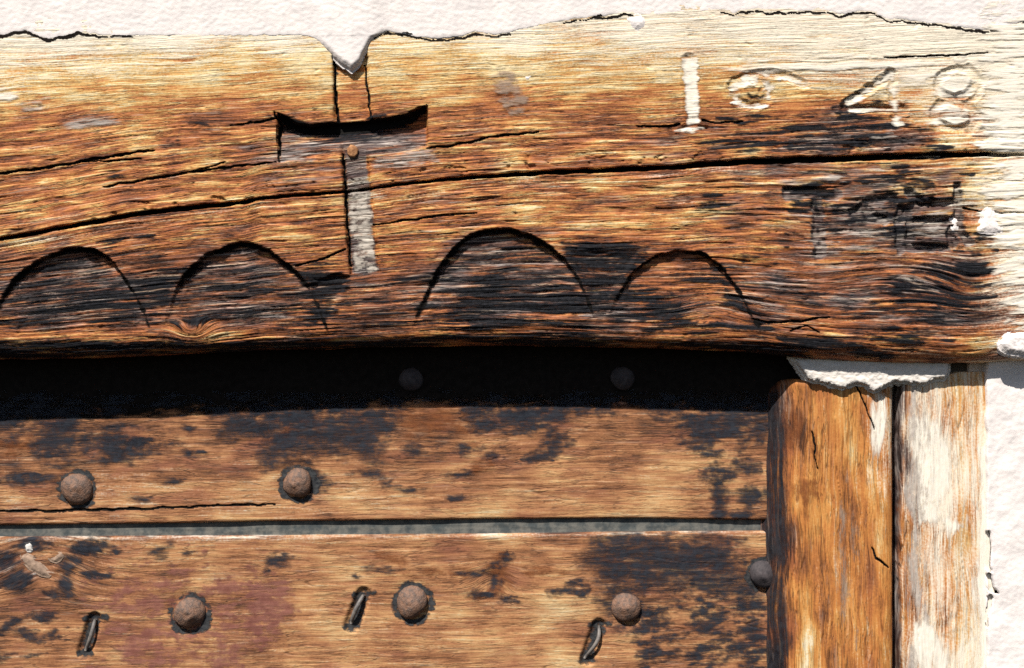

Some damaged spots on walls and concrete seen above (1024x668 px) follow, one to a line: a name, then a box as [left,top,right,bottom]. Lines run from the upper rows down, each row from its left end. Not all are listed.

crack [0,152,1011,267]
crack [855,386,875,430]
rust [56,468,96,509]
crack [0,503,276,513]
rust [277,464,321,504]
rust [167,590,213,634]